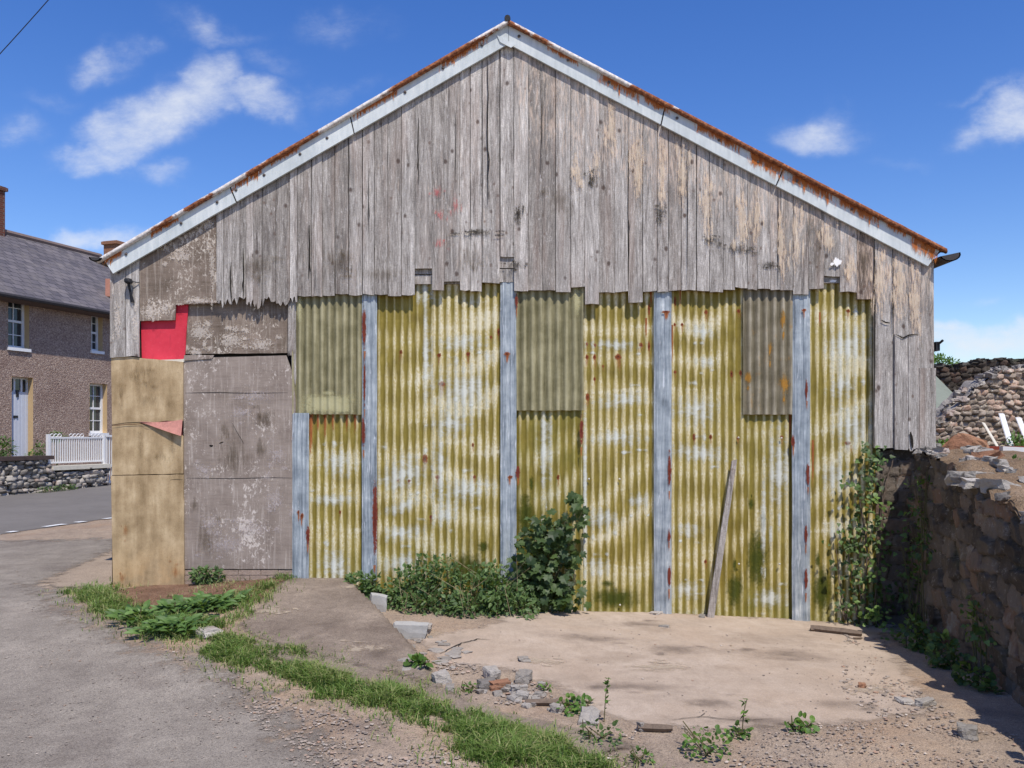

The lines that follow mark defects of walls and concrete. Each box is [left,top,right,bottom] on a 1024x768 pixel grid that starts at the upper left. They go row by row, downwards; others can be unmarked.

rust [439,39,484,69]
rust [353,89,398,119]
rust [600,74,669,113]
rust [232,148,297,191]
rust [697,124,938,261]
peeling [144,420,182,436]
rust [806,440,815,492]
water stain [454,543,487,584]
water stain [728,495,765,605]
water stain [595,581,631,606]